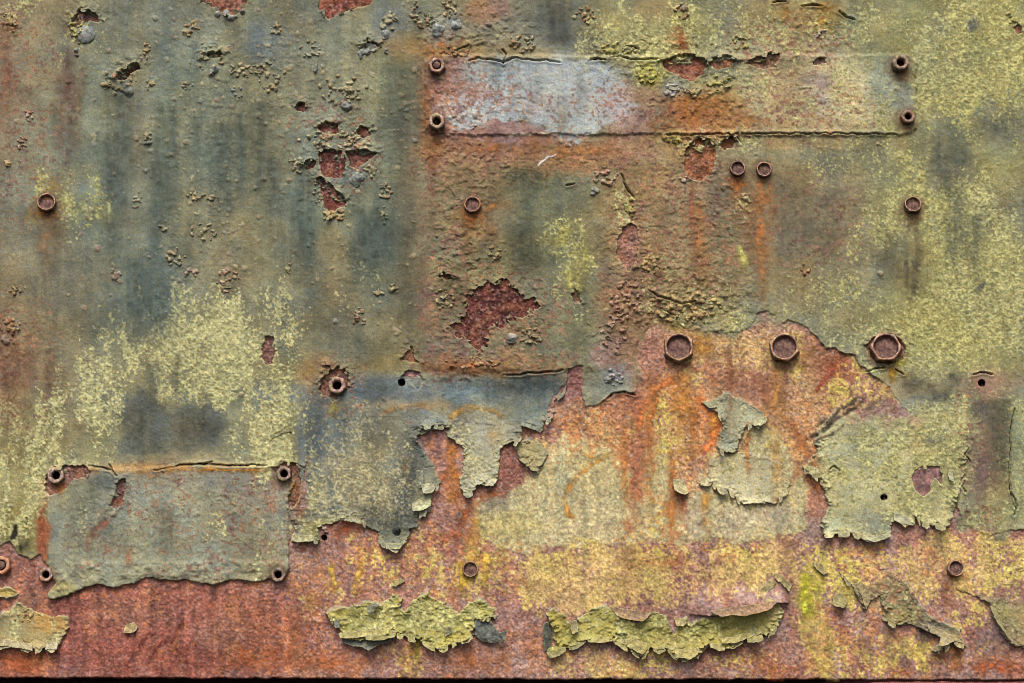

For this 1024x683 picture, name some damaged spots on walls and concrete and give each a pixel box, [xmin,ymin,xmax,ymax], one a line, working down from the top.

rust [684,137,738,181]
peeling [289,384,567,553]
rust [565,454,601,518]
rust [622,378,720,498]
rust [668,453,684,533]
peeling [673,391,792,506]
peeling [802,383,972,543]
peeling [0,585,70,654]
peeling [325,578,507,653]
peeling [543,573,792,662]
peeling [813,555,966,654]